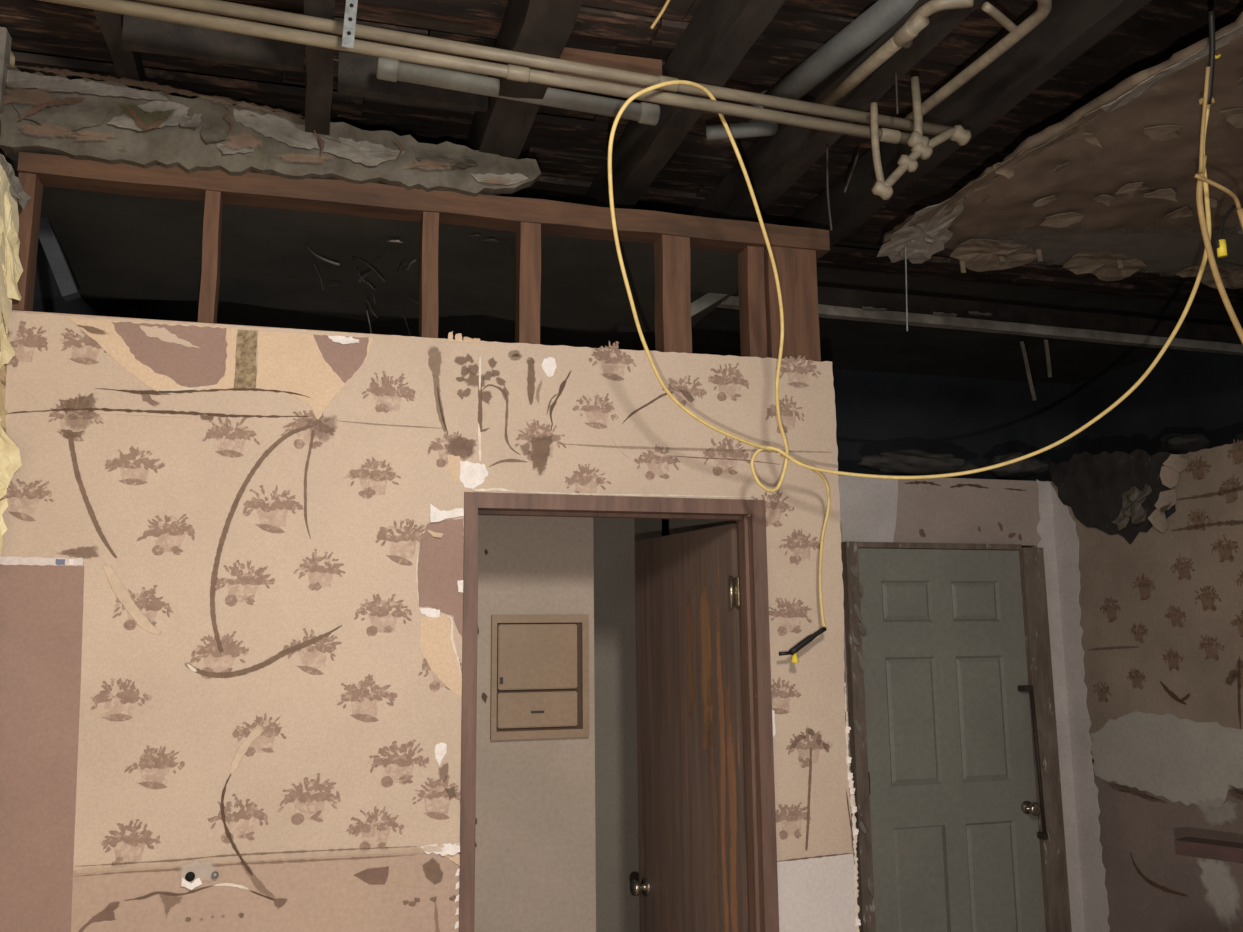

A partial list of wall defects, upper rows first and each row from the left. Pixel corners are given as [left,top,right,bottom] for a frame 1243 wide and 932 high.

peeling [6,70,202,131]
peeling [216,109,529,185]
peeling [0,156,19,368]
crack [6,388,310,420]
hole [1048,449,1188,544]
peeling [0,409,97,932]
crack [126,726,288,908]